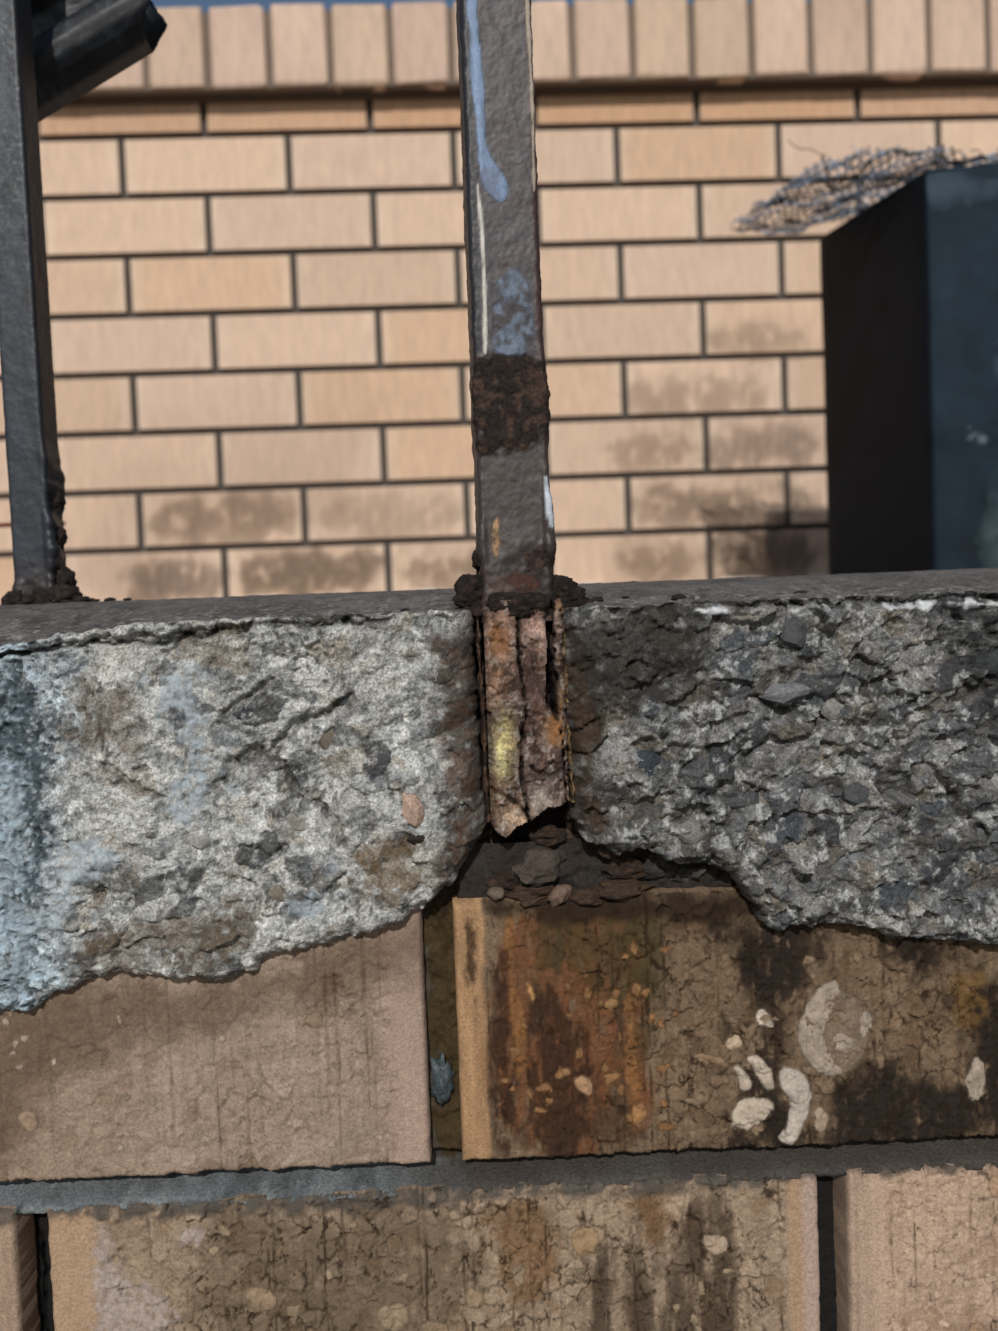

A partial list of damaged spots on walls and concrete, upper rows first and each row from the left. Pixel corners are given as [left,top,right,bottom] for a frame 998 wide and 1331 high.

rust [475,617,491,822]
leakage [511,982,535,1047]
peeling [500,1067,563,1113]
rust [491,948,592,1157]
peeling [565,971,650,1007]
peeling [601,1062,624,1096]
leakage [533,892,998,1148]
peeling [803,956,816,980]